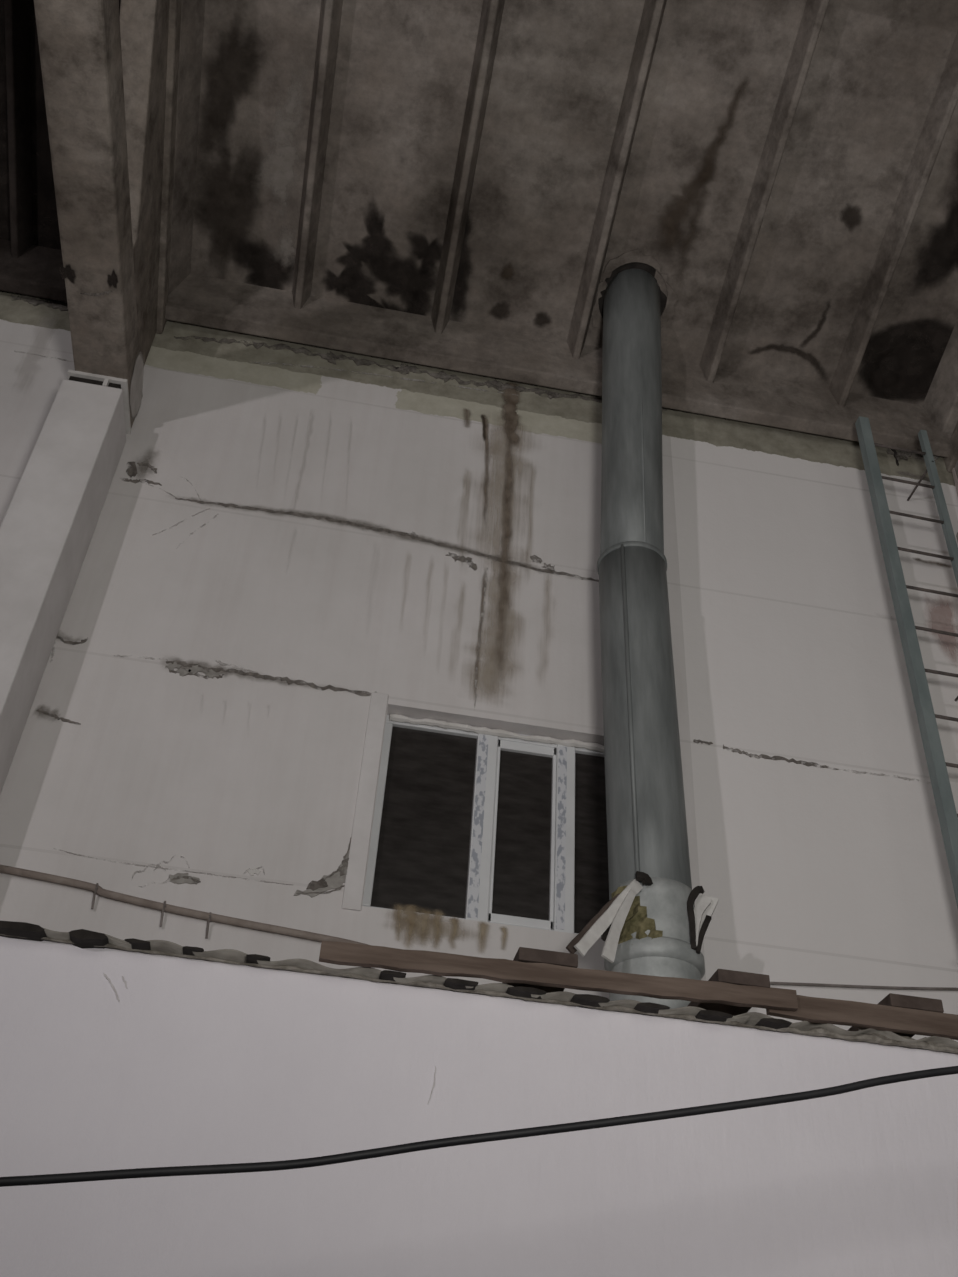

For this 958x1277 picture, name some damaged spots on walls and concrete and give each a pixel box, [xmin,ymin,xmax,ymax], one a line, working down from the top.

water stain [199,28,303,290]
water stain [325,208,442,316]
water stain [451,217,471,317]
water stain [860,320,954,401]
crack [152,480,599,582]
crack [37,706,78,724]
crack [119,655,370,696]
crack [693,739,910,780]
spalling [294,838,351,898]